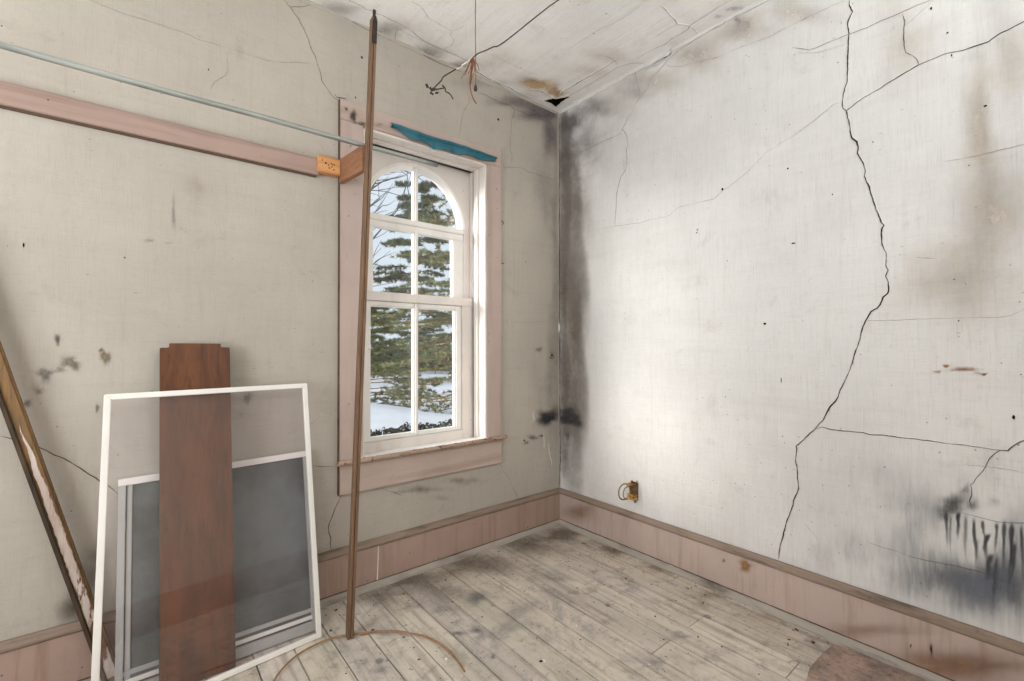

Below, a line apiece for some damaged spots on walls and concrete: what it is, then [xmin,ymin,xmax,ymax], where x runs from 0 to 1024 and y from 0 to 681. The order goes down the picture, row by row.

crack [94,0,337,100]
water stain [527,81,559,94]
water stain [512,100,586,430]
crack [344,0,1024,559]
water stain [937,498,1023,608]